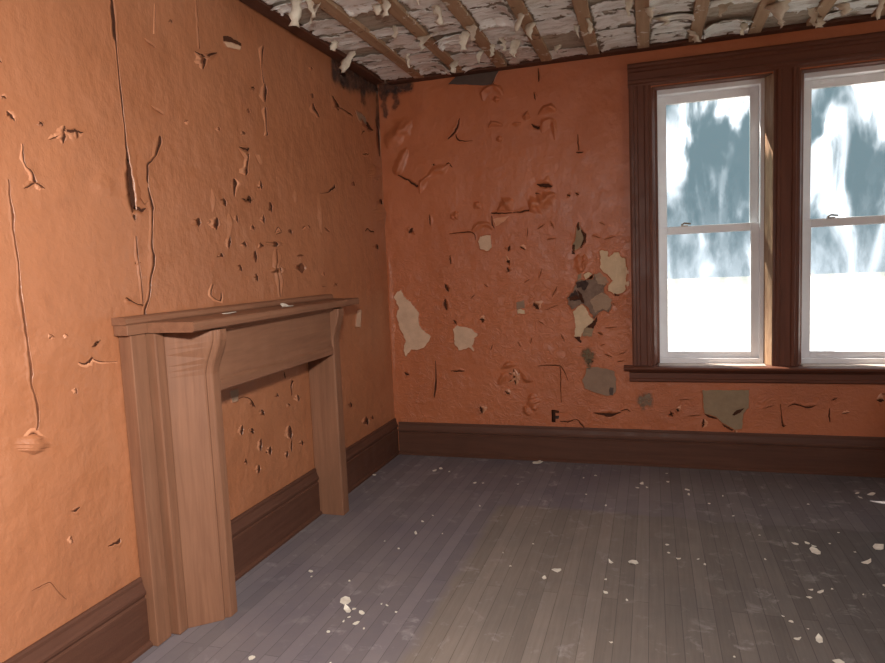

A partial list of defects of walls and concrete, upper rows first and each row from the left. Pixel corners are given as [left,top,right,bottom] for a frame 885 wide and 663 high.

spalling [223,36,241,51]
peeling [262,0,637,87]
peeling [645,0,885,43]
leakage [332,59,412,128]
crack [108,0,164,315]
spalling [572,222,587,254]
crack [6,179,41,434]
flaking render [393,289,432,357]
flaking render [452,324,479,352]
peeling [566,249,629,343]
flaking render [581,366,617,397]
flaking render [701,389,750,431]